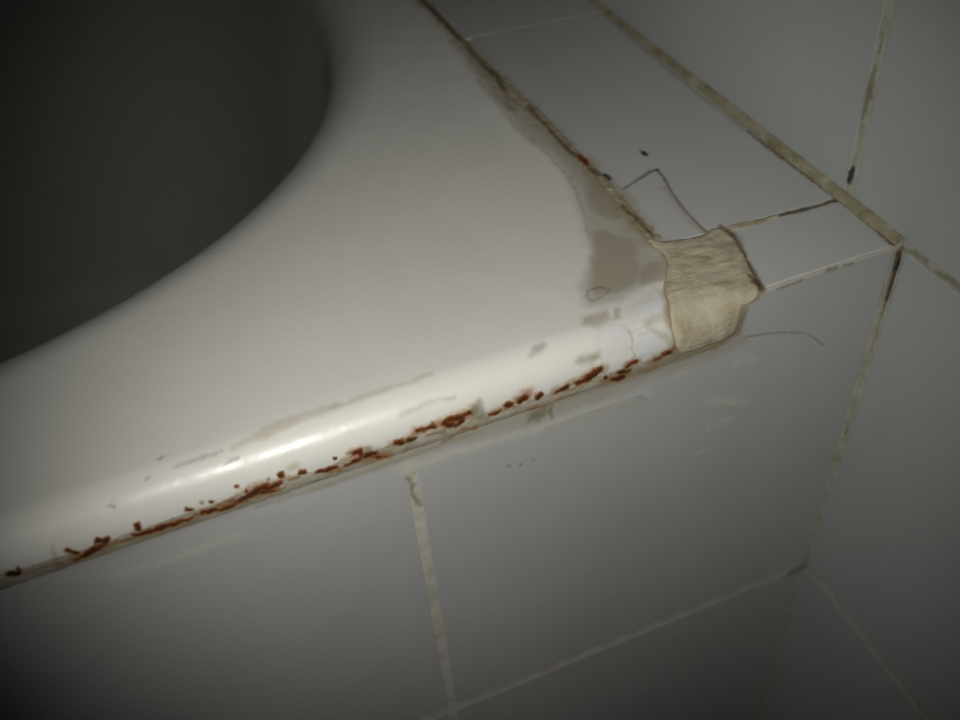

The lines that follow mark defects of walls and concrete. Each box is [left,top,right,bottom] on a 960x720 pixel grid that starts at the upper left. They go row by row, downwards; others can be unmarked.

damp [422,0,611,186]
crack [624,169,707,233]
corrosion [652,346,674,363]
corrosion [488,359,642,416]
corrosion [64,410,476,562]